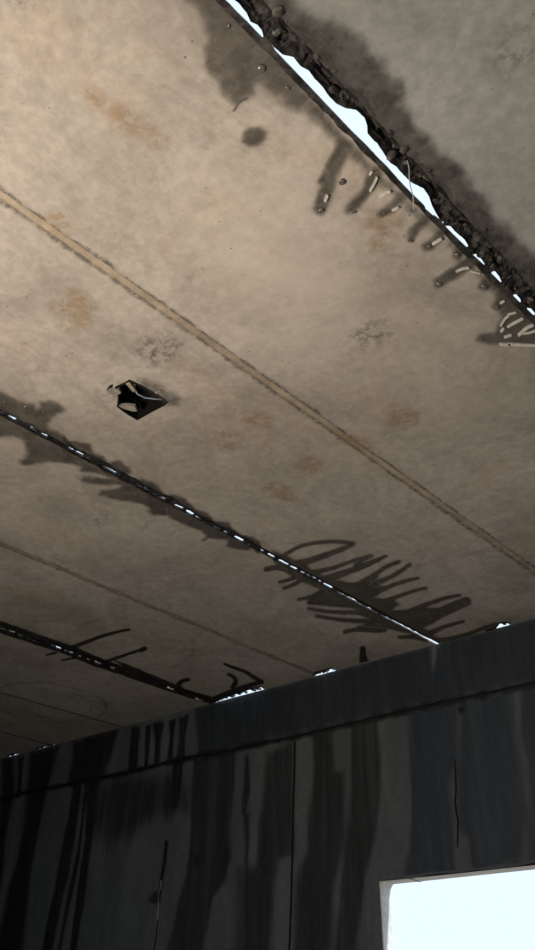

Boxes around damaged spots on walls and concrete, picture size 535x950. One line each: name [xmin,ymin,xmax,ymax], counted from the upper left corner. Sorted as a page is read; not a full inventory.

leakage [192,0,404,217]
leakage [264,0,535,290]
leakage [435,248,535,347]
leakage [0,394,260,552]
hole [107,380,176,420]
spalling [211,686,265,703]
leakage [0,540,535,950]